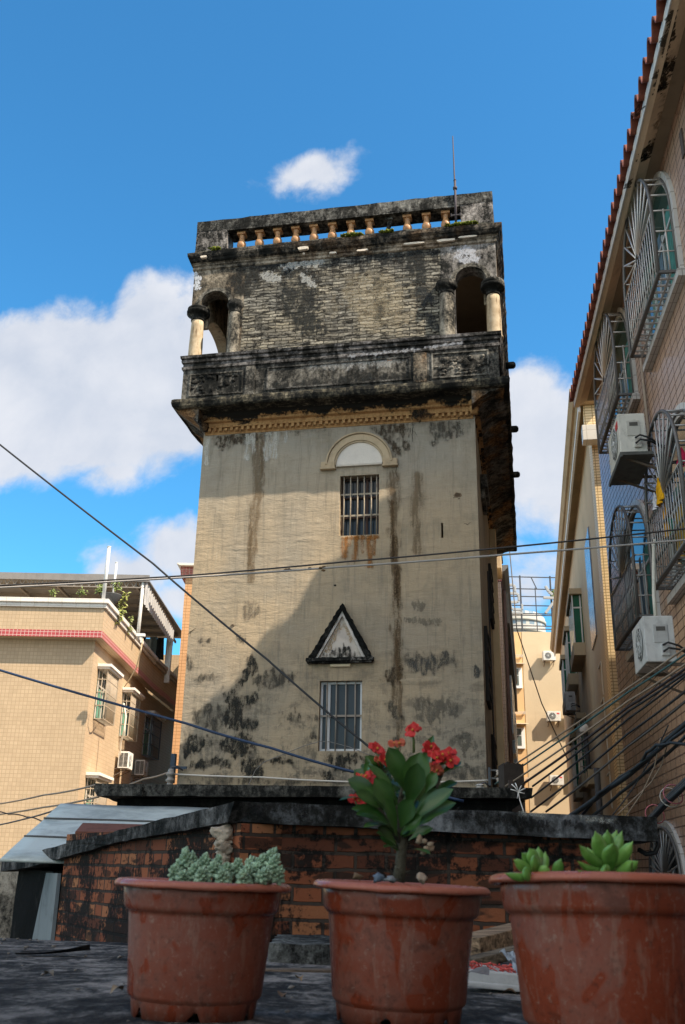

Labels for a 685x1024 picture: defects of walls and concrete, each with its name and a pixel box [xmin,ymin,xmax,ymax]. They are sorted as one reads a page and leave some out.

leakage [231,260,327,335]
leakage [372,278,386,319]
leakage [378,249,440,332]
leakage [454,245,480,264]
leakage [204,431,298,582]
rust [341,535,379,568]
leakage [389,472,400,606]
leakage [183,655,294,785]
leakage [385,620,456,751]